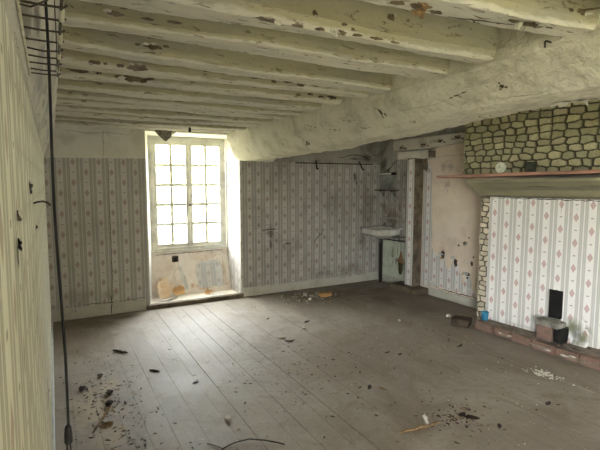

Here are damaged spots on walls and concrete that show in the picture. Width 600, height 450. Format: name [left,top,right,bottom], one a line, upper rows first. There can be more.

peeling [390,1,443,19]
peeling [569,7,600,16]
peeling [250,16,281,26]
peeling [314,23,383,40]
peeling [508,19,553,31]
peeling [65,60,107,74]
peeling [113,63,155,84]